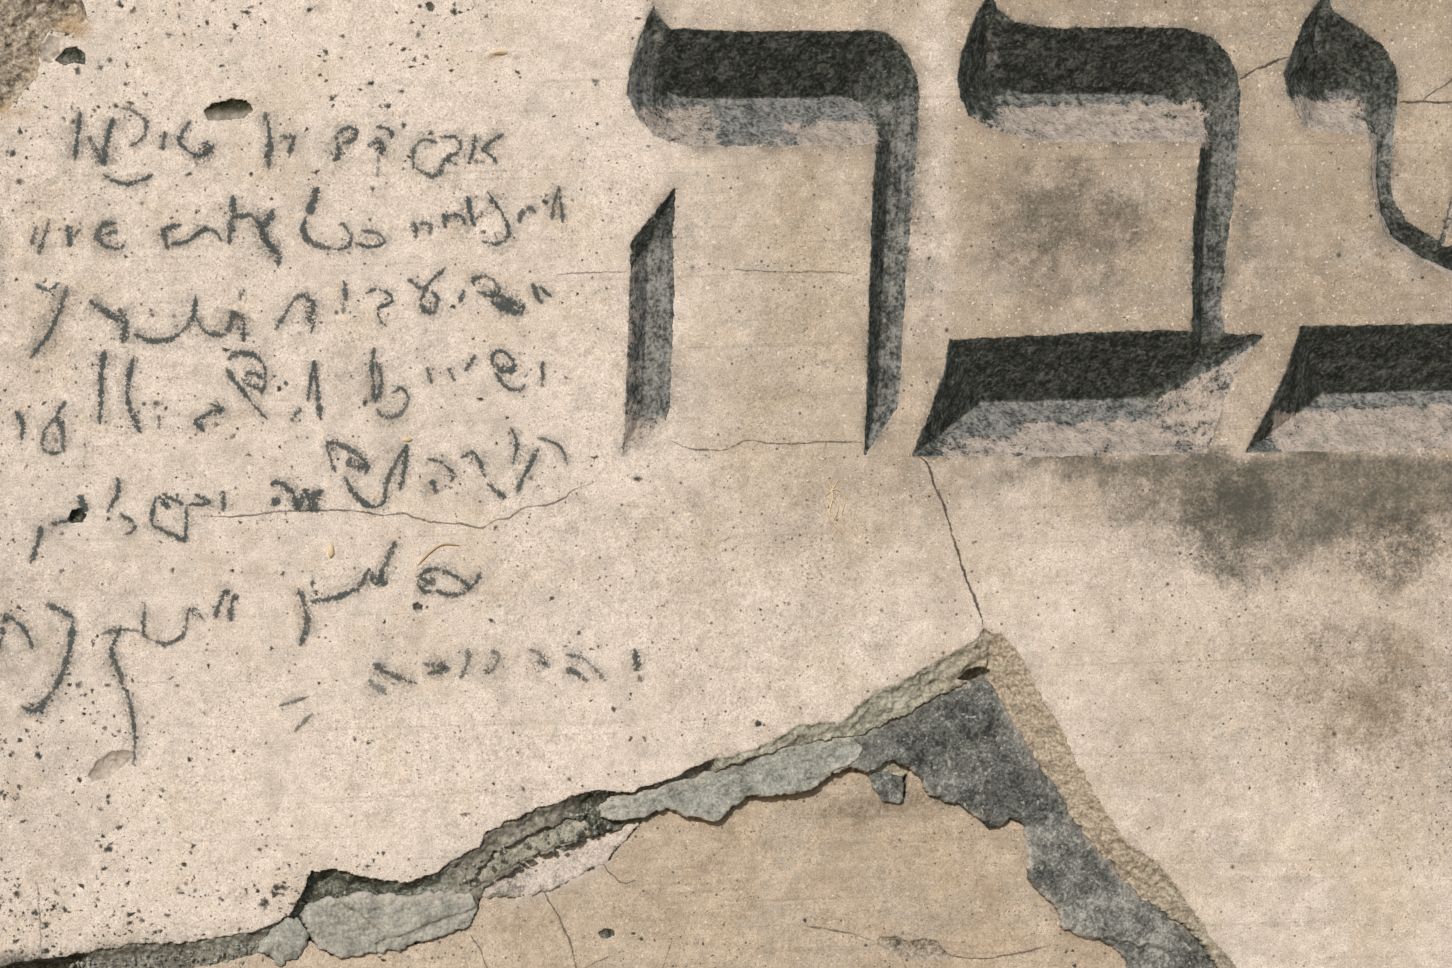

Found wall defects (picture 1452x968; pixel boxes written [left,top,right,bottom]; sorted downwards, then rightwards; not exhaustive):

spalling [0,0,87,113]
leakage [14,0,266,122]
leakage [317,3,496,108]
leakage [1065,451,1452,575]
peeling [87,750,133,781]
leakage [0,665,223,963]
leakage [244,811,311,921]
crack [0,456,1237,968]
peeling [598,928,615,939]
spalling [877,937,948,961]